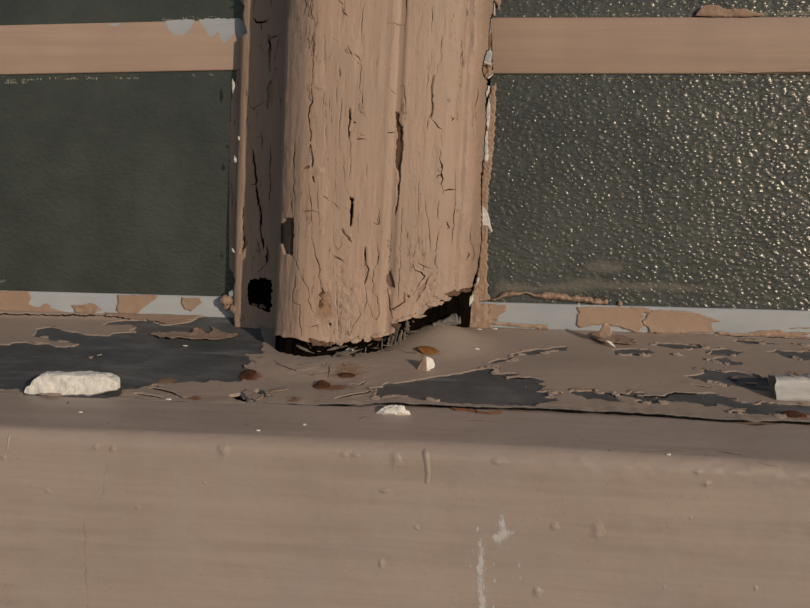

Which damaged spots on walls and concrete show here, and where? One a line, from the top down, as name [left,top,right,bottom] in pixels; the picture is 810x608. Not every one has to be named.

peeling [166,18,247,44]
crack [242,0,279,272]
crack [292,0,367,335]
crack [350,7,478,335]
peeling [482,206,492,232]
peeling [484,61,494,162]
peeling [0,291,268,398]
peeling [469,277,549,329]
peeling [368,306,810,418]
leakage [470,514,515,608]